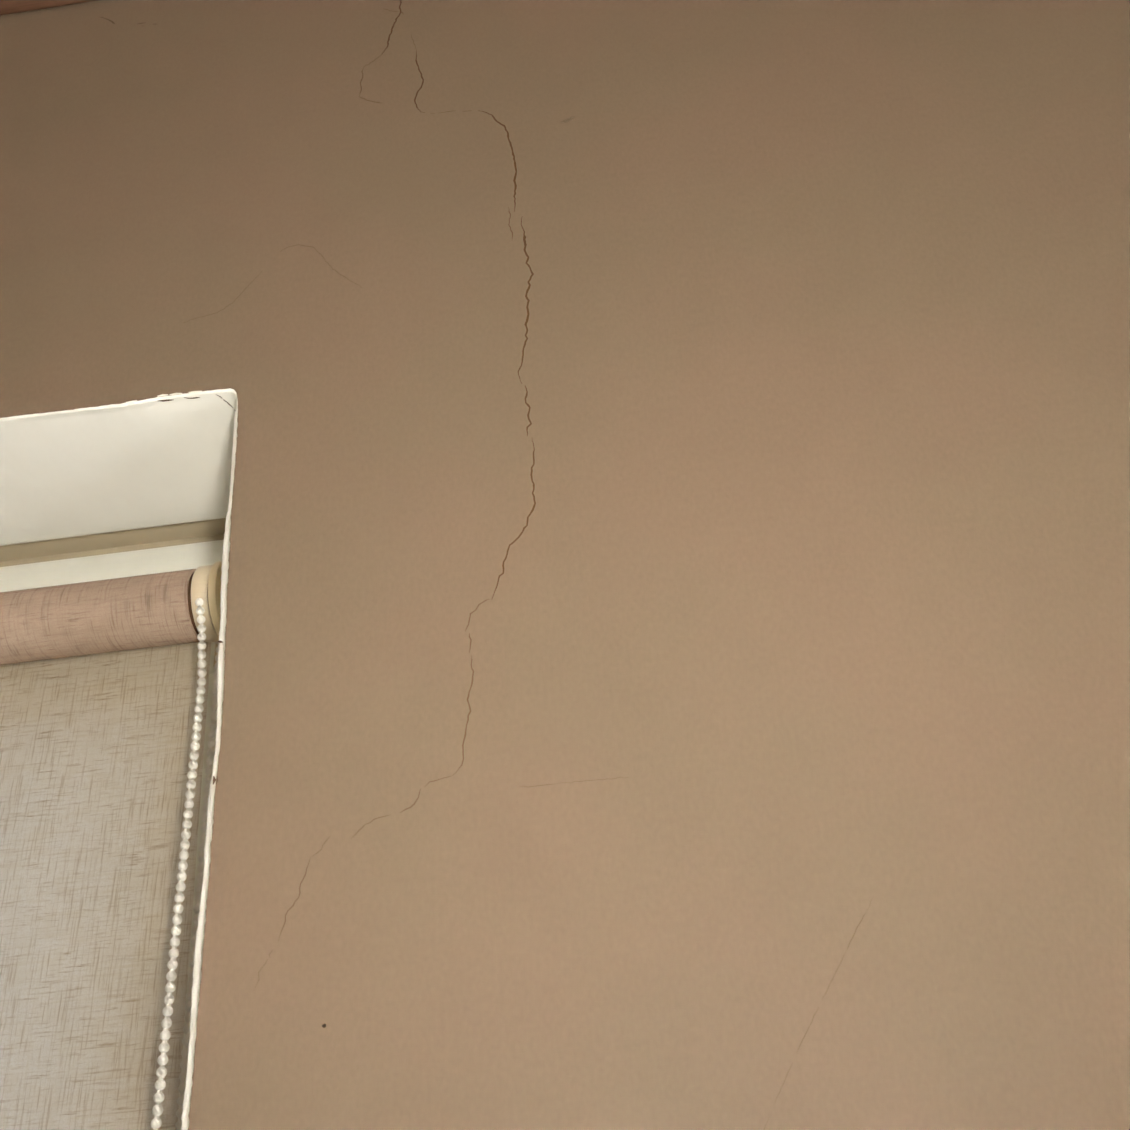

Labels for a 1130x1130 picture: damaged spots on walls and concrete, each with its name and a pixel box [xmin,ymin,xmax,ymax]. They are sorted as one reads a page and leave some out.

crack [257,0,536,983]